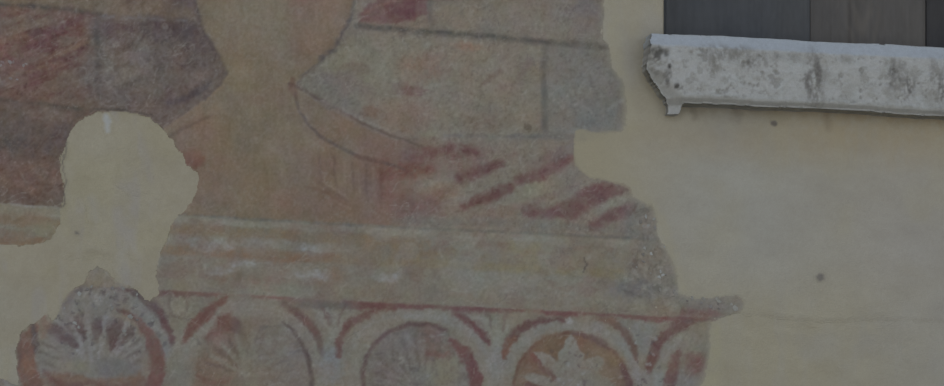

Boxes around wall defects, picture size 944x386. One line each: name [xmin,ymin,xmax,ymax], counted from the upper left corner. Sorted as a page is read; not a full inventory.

flaking render [0,111,199,385]